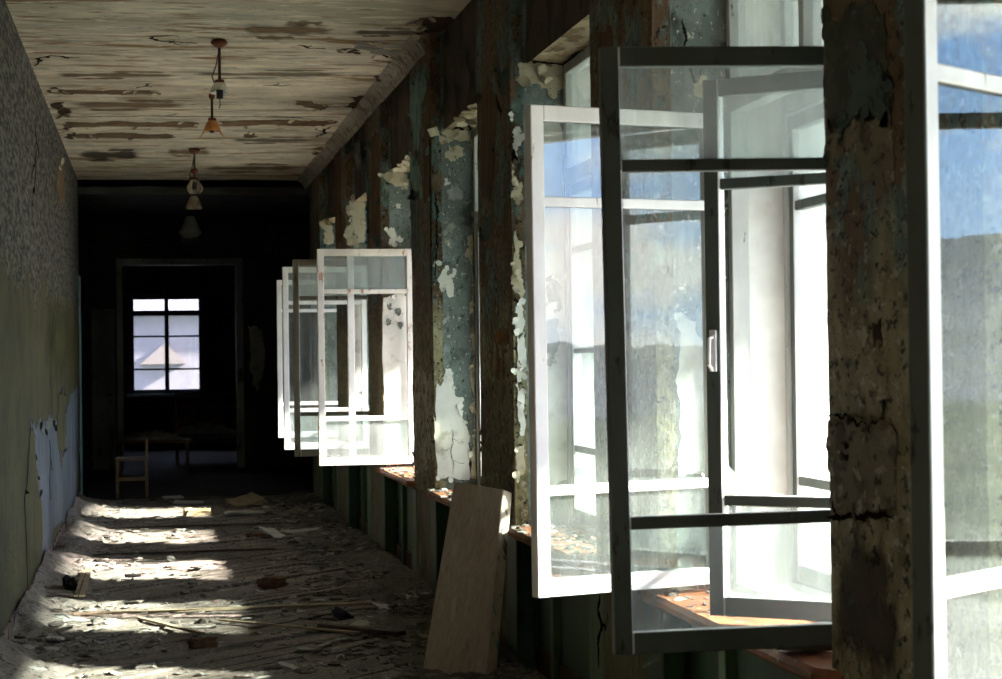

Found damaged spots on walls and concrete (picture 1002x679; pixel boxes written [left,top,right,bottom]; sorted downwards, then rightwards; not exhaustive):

peeling [336,40,403,60]
peeling [43,87,199,141]
peeling [217,96,363,138]
peeling [319,61,564,500]
peeling [543,122,568,485]
crack [826,398,885,428]
peeling [25,386,80,589]
crack [827,501,893,522]